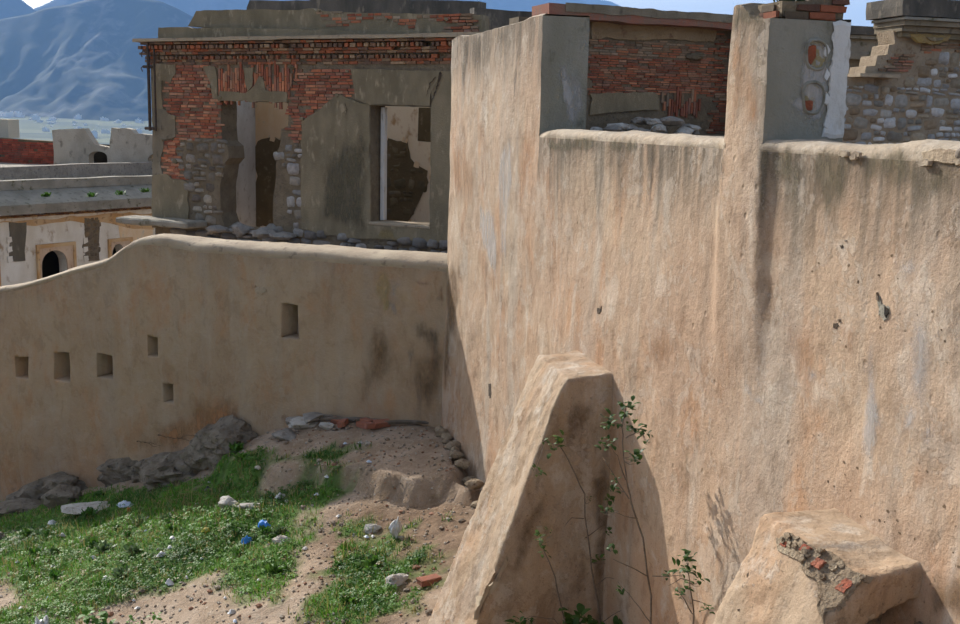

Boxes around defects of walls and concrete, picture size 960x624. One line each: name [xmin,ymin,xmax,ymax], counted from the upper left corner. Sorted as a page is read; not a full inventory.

spalling [160,60,355,227]
water stain [549,138,593,151]
spalling [838,150,862,160]
spalling [917,148,960,167]
spalling [776,532,874,624]